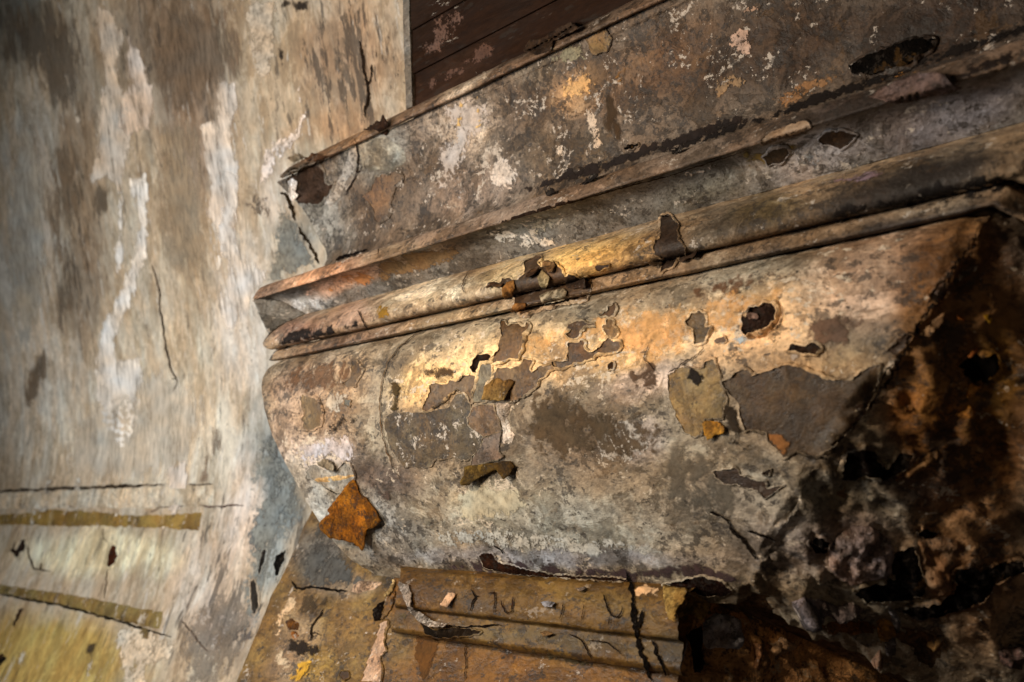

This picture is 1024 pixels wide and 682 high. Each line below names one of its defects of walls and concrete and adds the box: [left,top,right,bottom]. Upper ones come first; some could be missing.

spalling [846,34,939,80]
crack [345,41,372,195]
spalling [284,153,336,208]
water stain [0,0,314,492]
peeling [648,211,697,275]
crack [151,265,177,392]
peeling [383,254,624,486]
water stain [687,368,703,386]
water stain [722,405,741,444]
peeling [665,278,965,500]
crack [559,572,666,681]